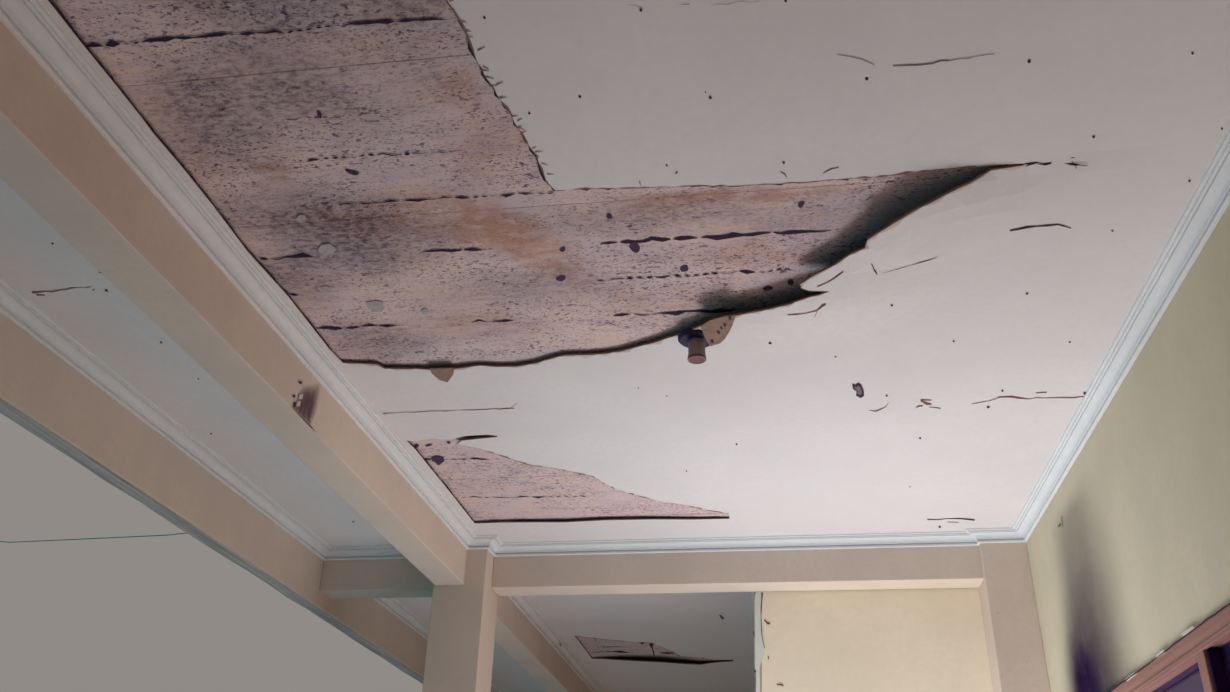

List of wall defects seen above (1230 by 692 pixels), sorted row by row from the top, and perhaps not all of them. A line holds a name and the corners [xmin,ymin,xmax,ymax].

peeling [49,0,1028,382]
peeling [408,435,730,523]
peeling [576,636,733,664]